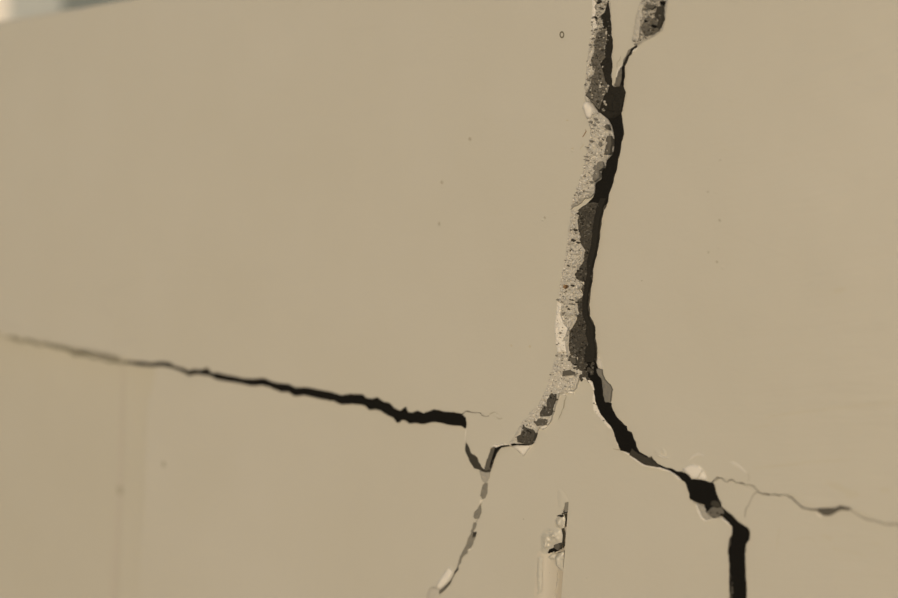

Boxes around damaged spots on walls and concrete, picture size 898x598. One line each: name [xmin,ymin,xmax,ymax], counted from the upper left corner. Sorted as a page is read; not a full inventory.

crack [4,336,510,594]
spalling [491,0,707,480]
crack [582,1,817,598]